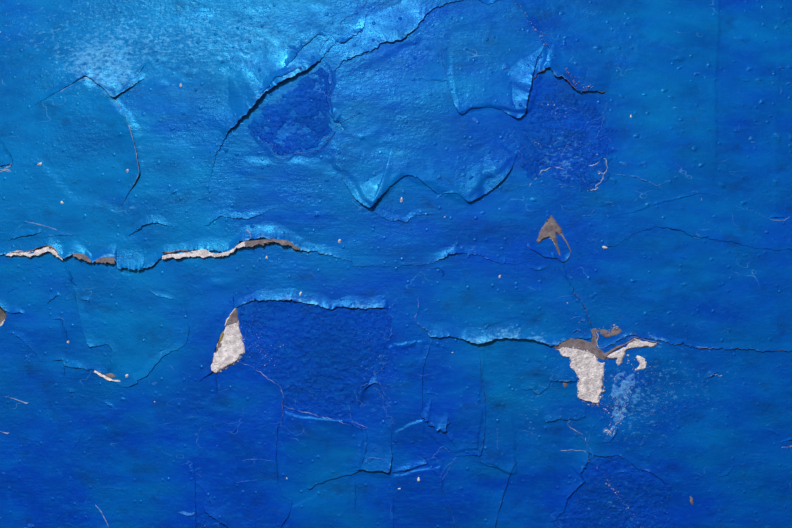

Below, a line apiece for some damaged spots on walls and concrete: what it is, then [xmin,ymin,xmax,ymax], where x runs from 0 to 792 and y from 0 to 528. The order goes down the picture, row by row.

peeling [192,0,463,186]
peeling [343,42,618,223]
spalling [0,296,25,326]
crack [0,221,524,304]
peeling [197,287,392,437]
crack [349,309,459,448]
peeling [415,296,661,410]
spalling [526,215,571,270]
crack [561,422,595,460]
peeling [547,447,676,528]